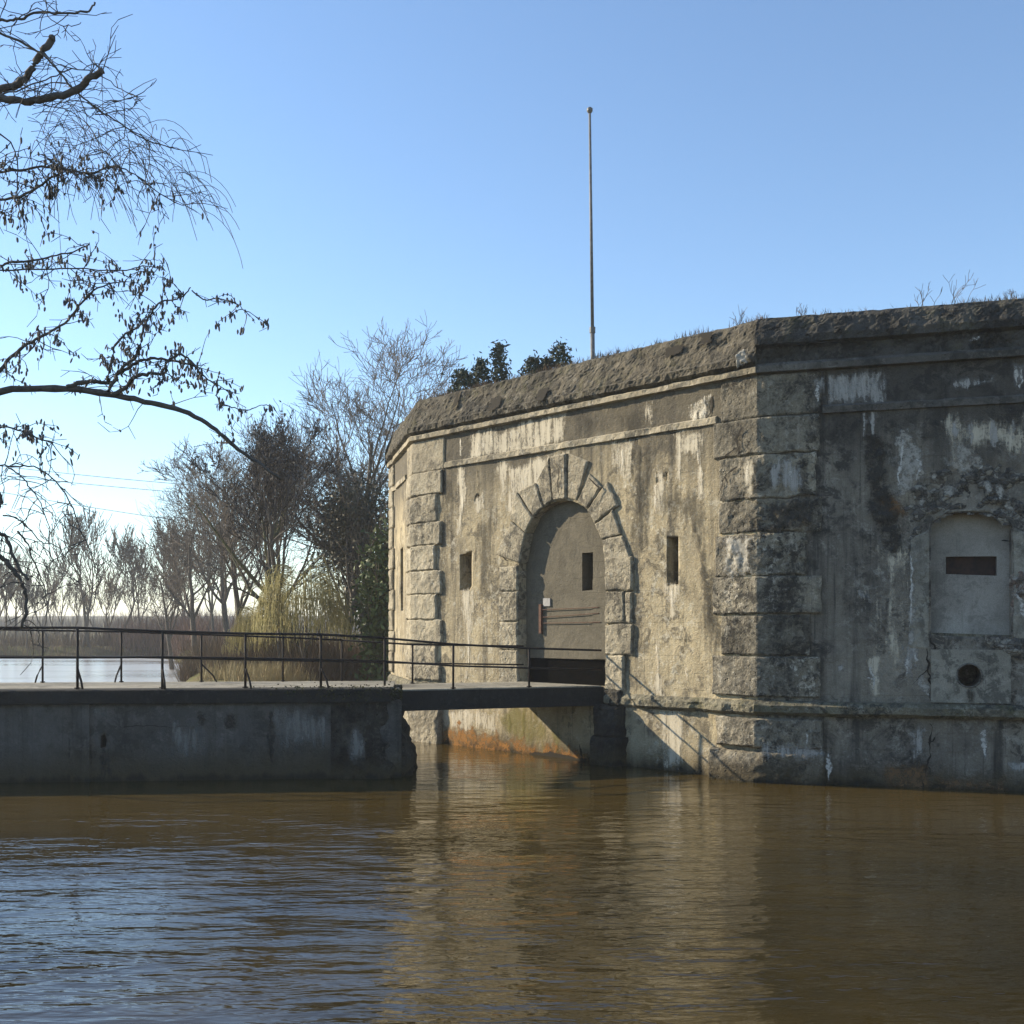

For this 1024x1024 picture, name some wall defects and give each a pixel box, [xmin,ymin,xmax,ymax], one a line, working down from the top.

water stain [814,372,886,437]
water stain [941,413,1024,453]
spalling [863,428,1024,696]
rust [442,720,590,759]
crack [912,638,936,788]